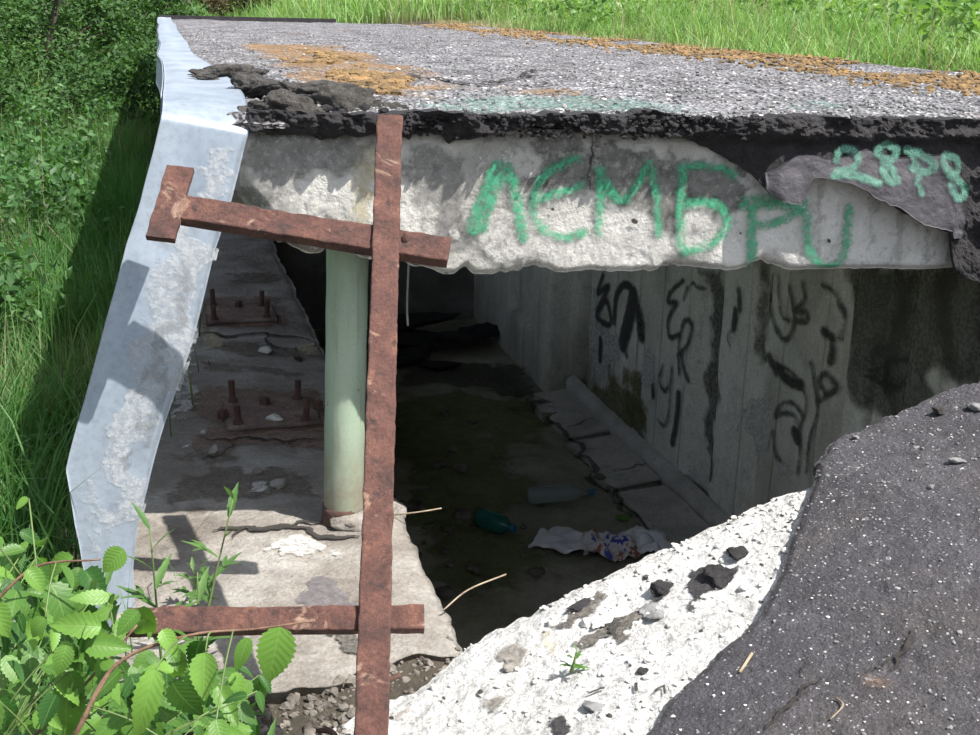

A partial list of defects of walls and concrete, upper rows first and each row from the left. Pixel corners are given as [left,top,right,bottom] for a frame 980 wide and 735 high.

crack [195,332,310,349]
water stain [703,272,724,481]
water stain [754,265,772,360]
water stain [847,268,980,416]
crack [532,399,646,518]
crack [214,519,360,539]